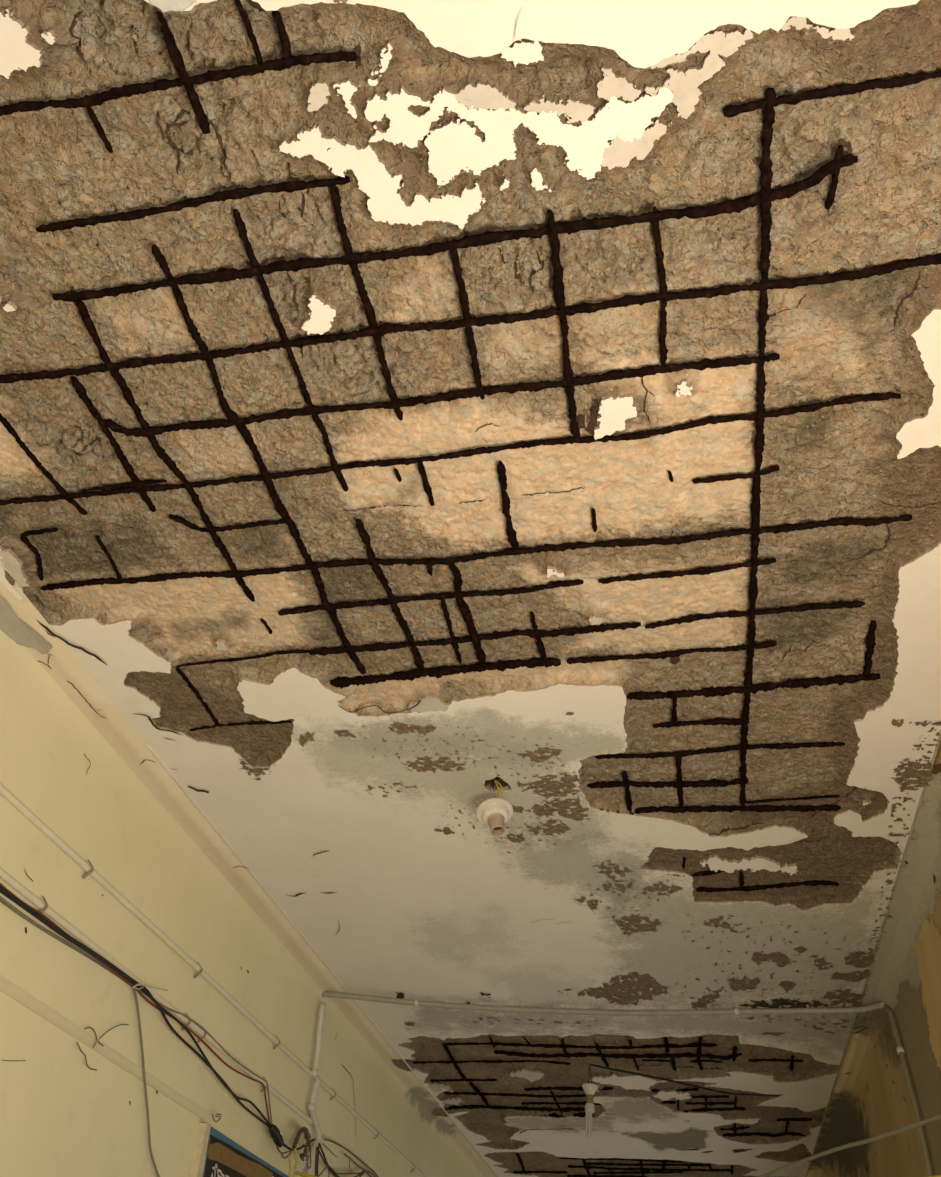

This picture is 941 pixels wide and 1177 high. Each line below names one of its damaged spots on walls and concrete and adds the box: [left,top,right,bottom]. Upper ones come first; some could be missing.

rust [0,0,358,153]
spalling [0,0,941,375]
rust [0,70,941,815]
spalling [0,204,941,1009]
rust [667,857,839,892]
rust [413,1036,803,1118]
spalling [392,1016,839,1177]
rust [512,1153,734,1177]
rust [651,1087,812,1137]